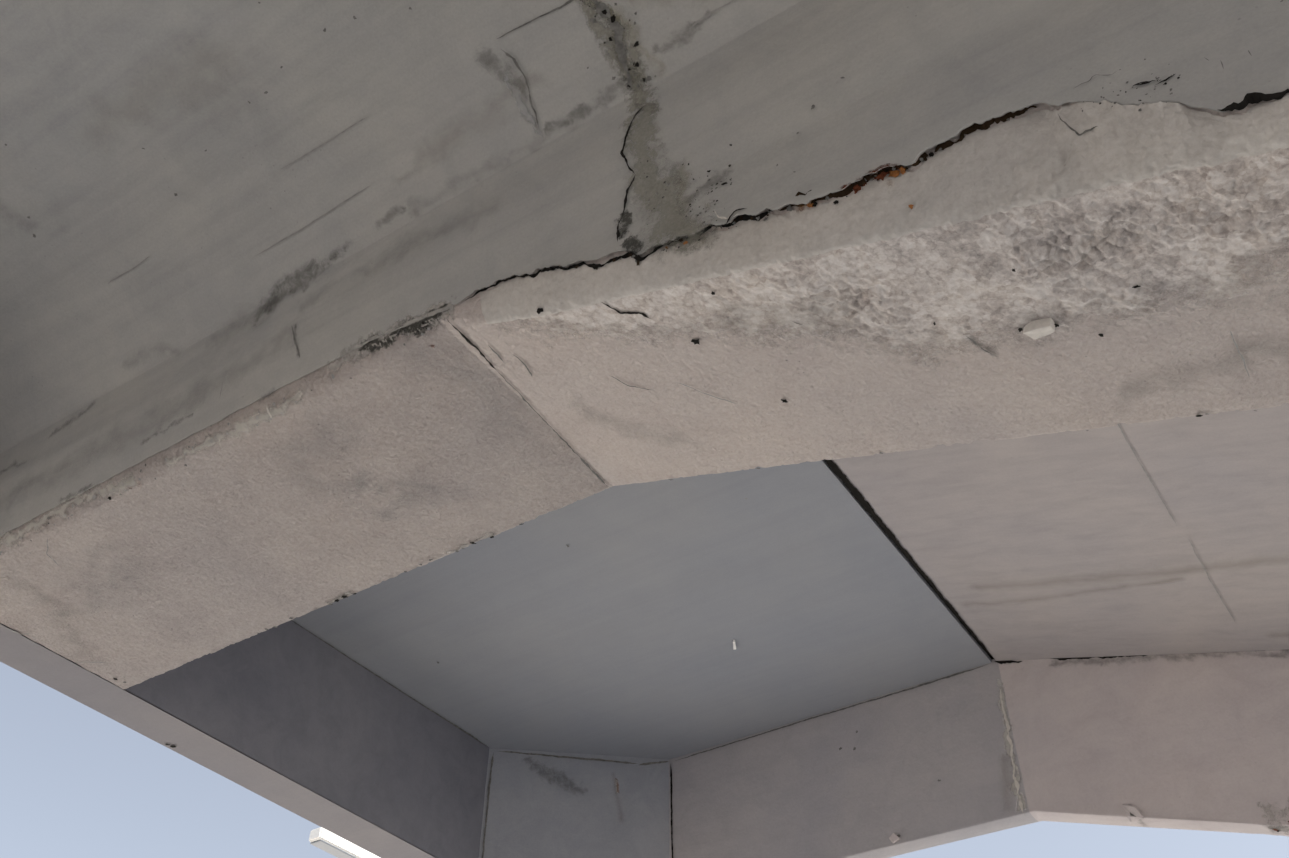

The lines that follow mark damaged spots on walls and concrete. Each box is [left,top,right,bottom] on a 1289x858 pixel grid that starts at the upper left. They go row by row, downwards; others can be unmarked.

spalling [582,0,656,105]
crack [447,0,1037,486]
spalling [480,64,1289,363]
crack [1219,89,1289,111]